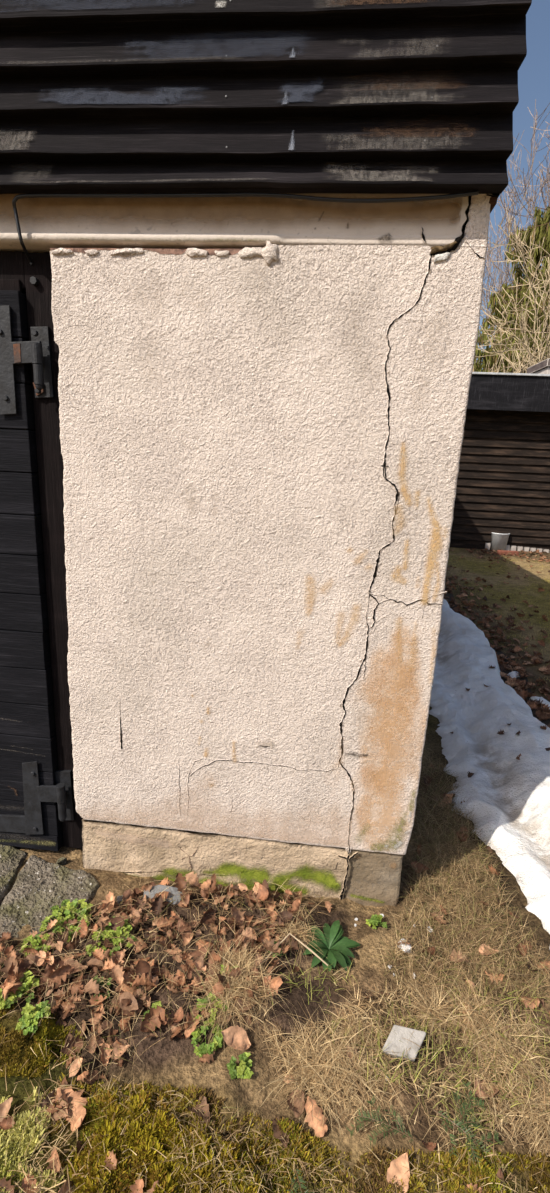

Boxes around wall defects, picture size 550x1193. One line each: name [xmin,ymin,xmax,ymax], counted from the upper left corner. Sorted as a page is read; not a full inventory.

flaking render [50,247,264,259]
crack [466,241,486,259]
crack [178,227,447,900]
crack [113,846,225,876]